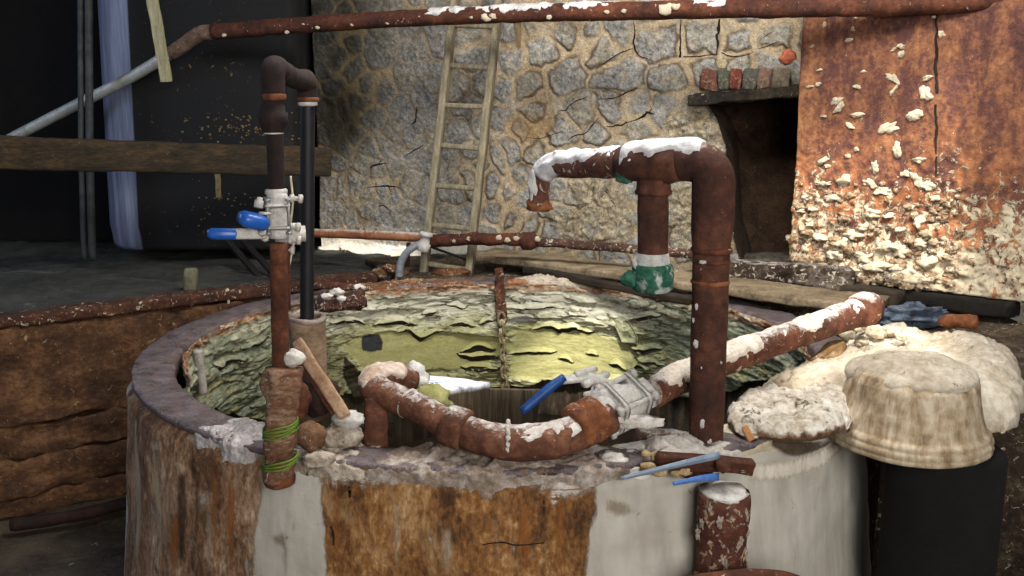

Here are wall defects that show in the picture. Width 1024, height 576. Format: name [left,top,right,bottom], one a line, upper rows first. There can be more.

crack [595,21,648,70]
crack [527,87,654,140]
corrosion [783,0,1024,303]
peeling [330,301,574,372]
peeling [507,302,598,334]
peeling [606,310,667,371]
spalling [343,357,362,397]
leakage [194,417,265,465]
corrosion [320,477,597,576]